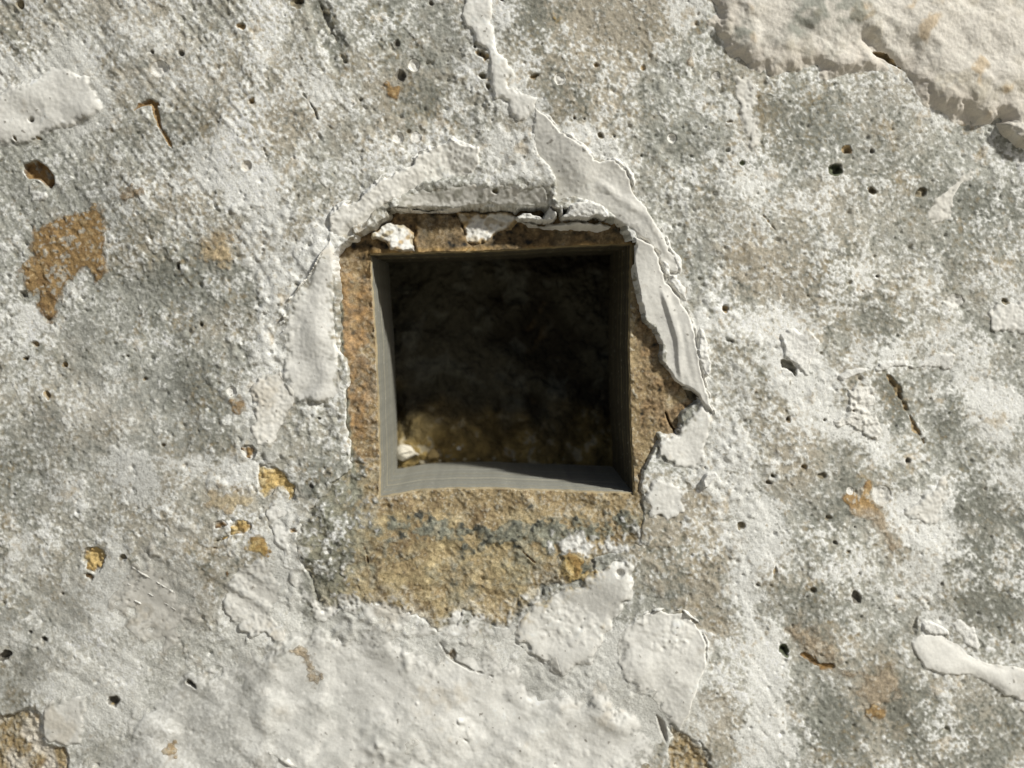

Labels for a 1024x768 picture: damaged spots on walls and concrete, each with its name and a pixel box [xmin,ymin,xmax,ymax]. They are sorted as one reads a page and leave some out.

crack [134,99,172,148]
spalling [24,160,55,188]
spalling [19,203,106,323]
spalling [241,107,716,659]
spalling [83,546,106,580]
spalling [0,707,70,768]